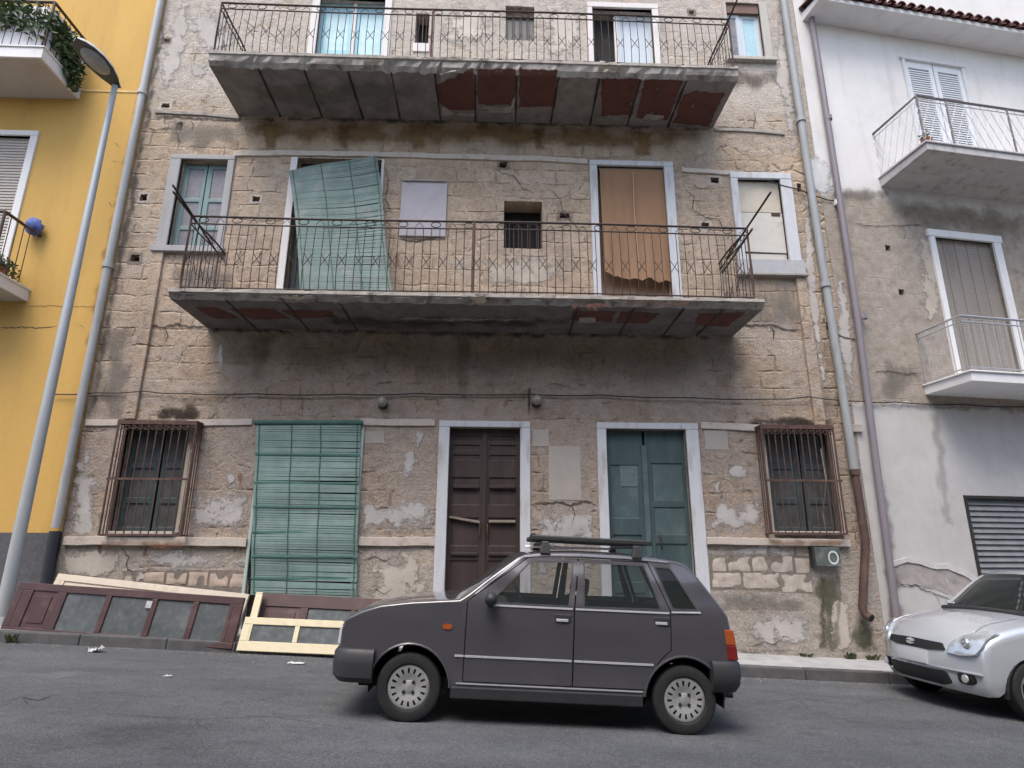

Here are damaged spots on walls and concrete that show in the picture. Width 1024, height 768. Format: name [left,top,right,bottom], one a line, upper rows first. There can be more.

peeling [160,1,235,89]
spalling [437,68,558,116]
spalling [598,64,725,126]
crack [494,167,578,229]
peeling [71,452,100,536]
peeling [192,474,252,533]
peeling [362,496,432,535]
crack [531,500,597,524]
peeling [538,512,597,547]
spalling [62,549,249,593]
peeling [365,552,427,599]
leakage [820,578,840,647]